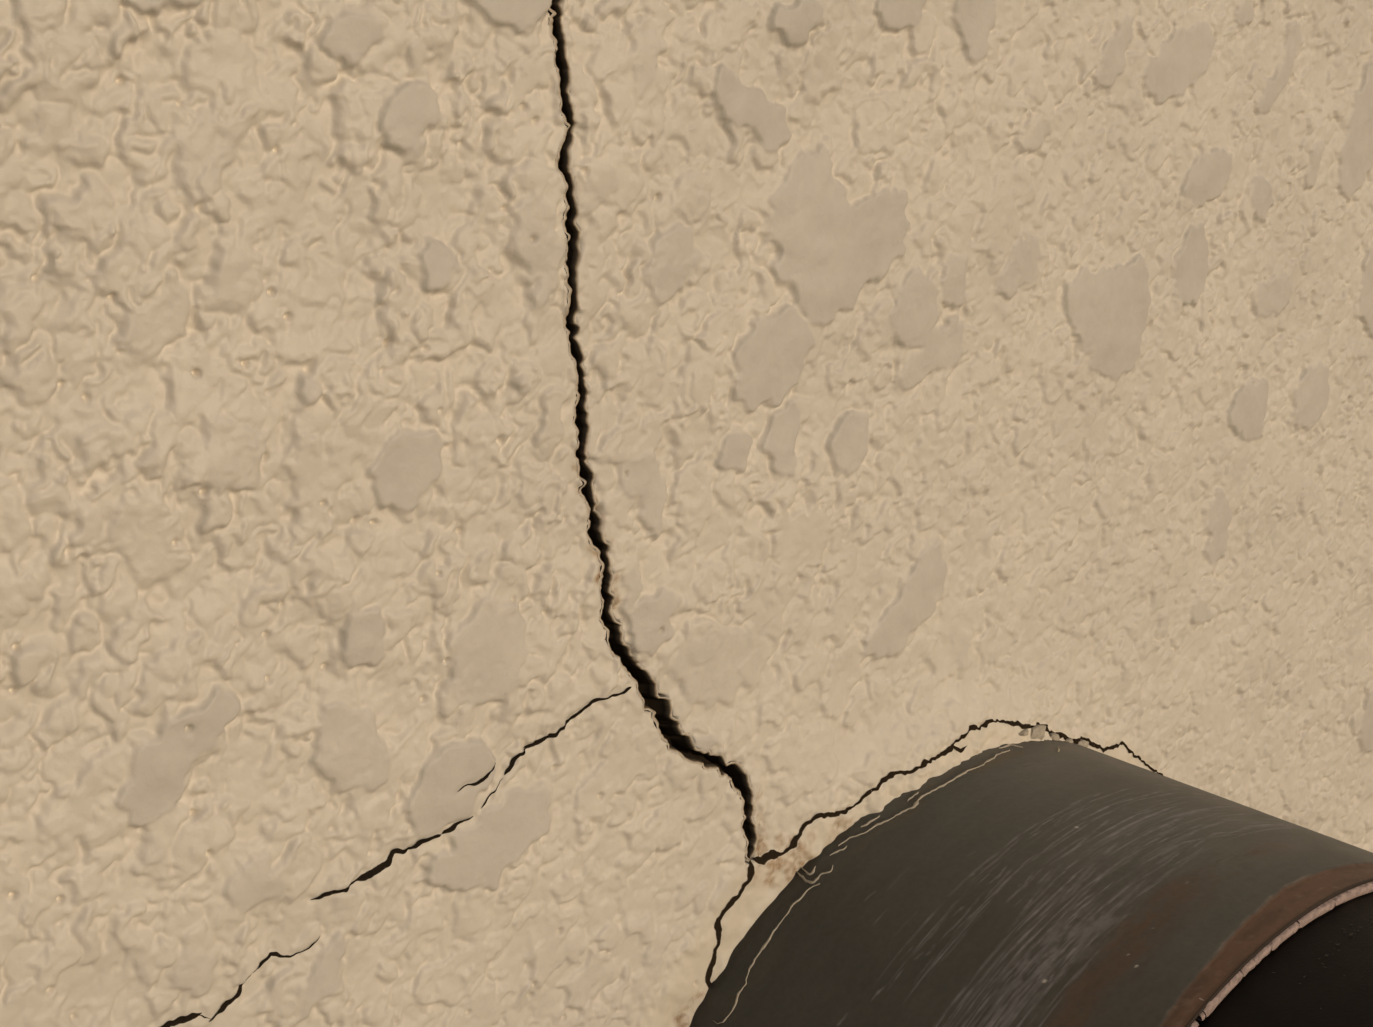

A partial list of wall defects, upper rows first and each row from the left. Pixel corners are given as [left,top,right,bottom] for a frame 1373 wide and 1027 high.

crack [161,937,320,1027]
crack [311,0,1163,988]